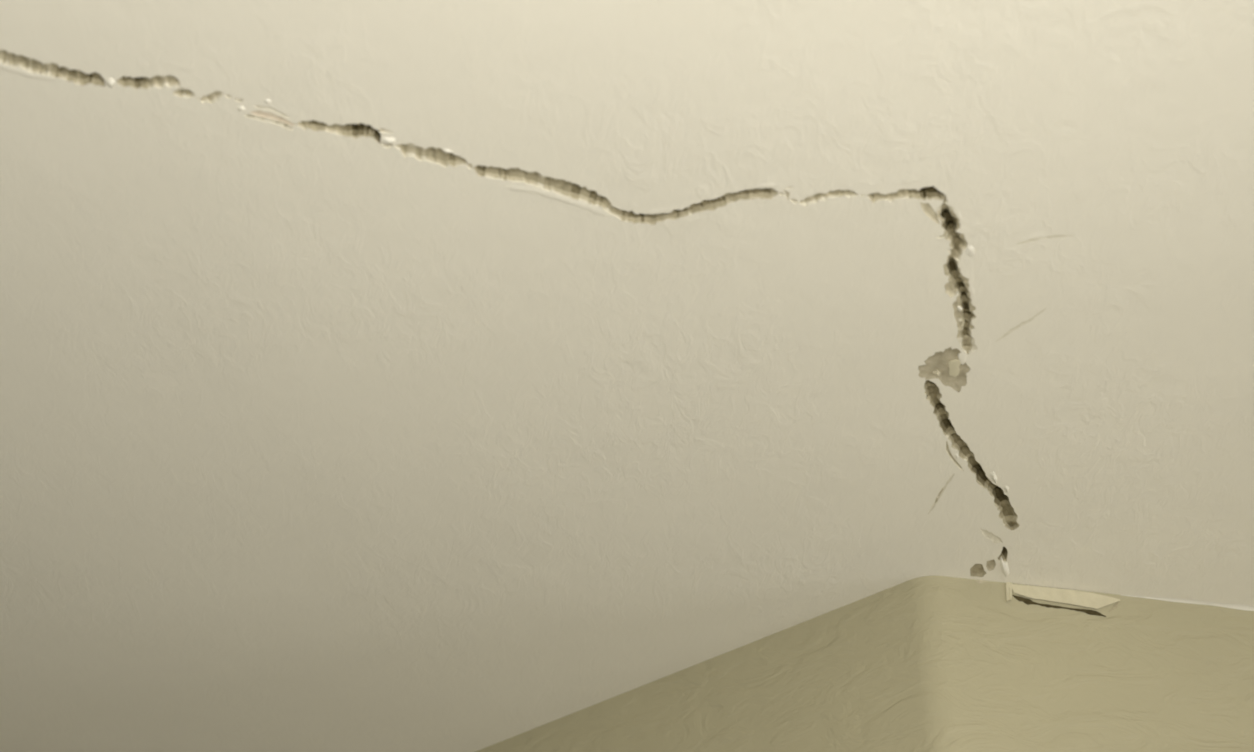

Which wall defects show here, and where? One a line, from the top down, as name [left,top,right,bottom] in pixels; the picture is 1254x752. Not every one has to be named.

crack [0,49,1047,354]
crack [924,380,1019,562]